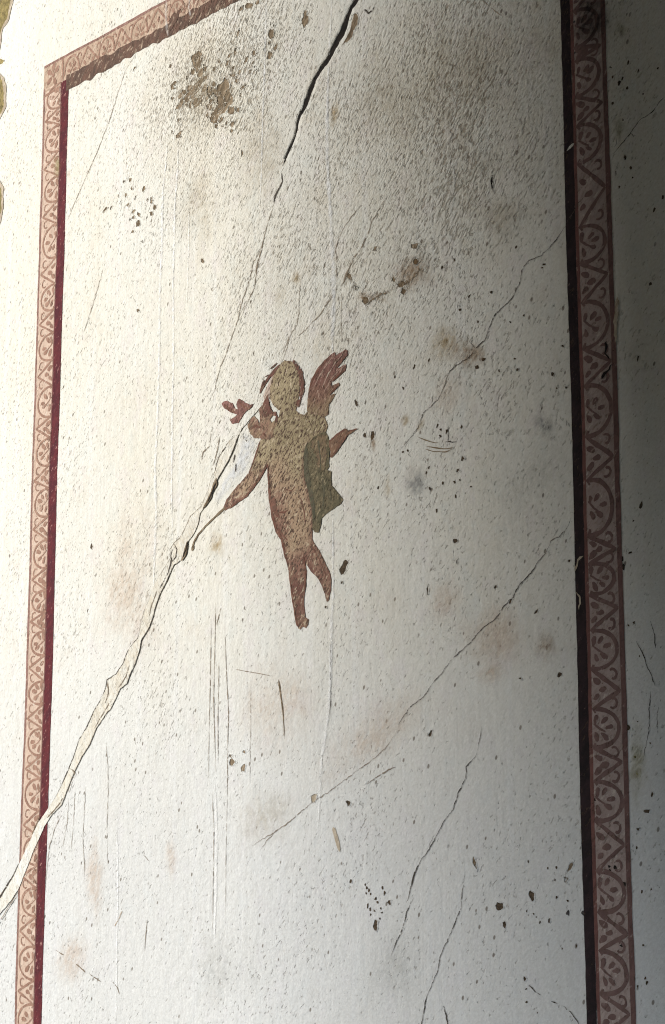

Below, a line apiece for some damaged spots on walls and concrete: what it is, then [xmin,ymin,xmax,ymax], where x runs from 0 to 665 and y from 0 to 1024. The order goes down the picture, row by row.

flaking render [168,0,278,139]
crack [213,0,387,397]
crack [405,198,583,444]
crack [0,409,258,919]
crack [255,522,570,846]
crack [391,733,481,954]
crack [421,875,465,1024]